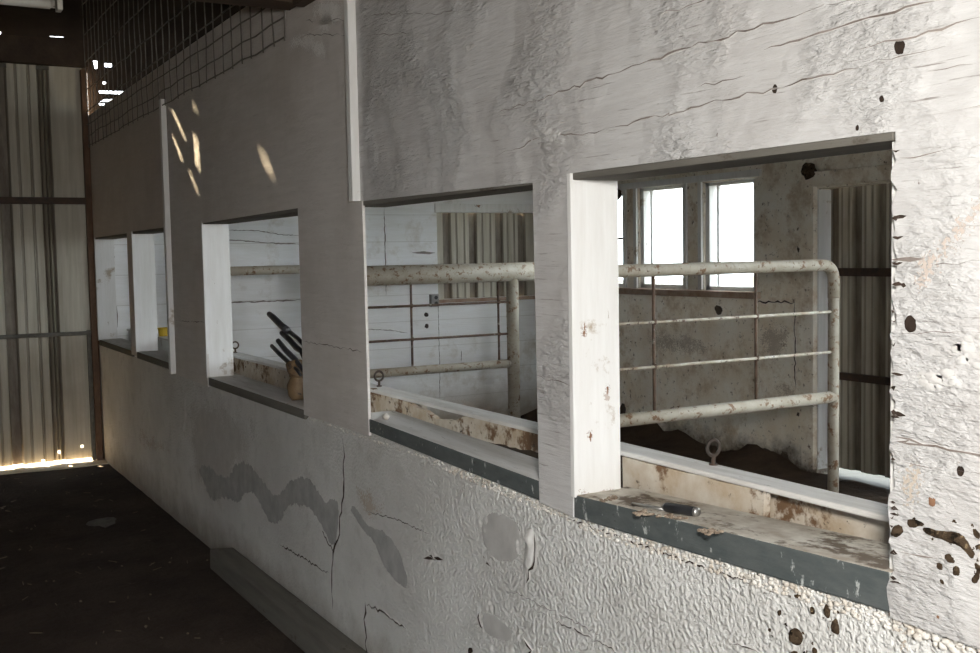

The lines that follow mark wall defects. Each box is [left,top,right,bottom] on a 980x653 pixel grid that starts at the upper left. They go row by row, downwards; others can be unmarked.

crack [492,0,979,159]
peeling [199,461,339,545]
crack [280,437,345,609]
crack [369,511,443,561]
spalling [309,416,980,653]
crack [363,602,407,652]
crack [504,587,630,653]